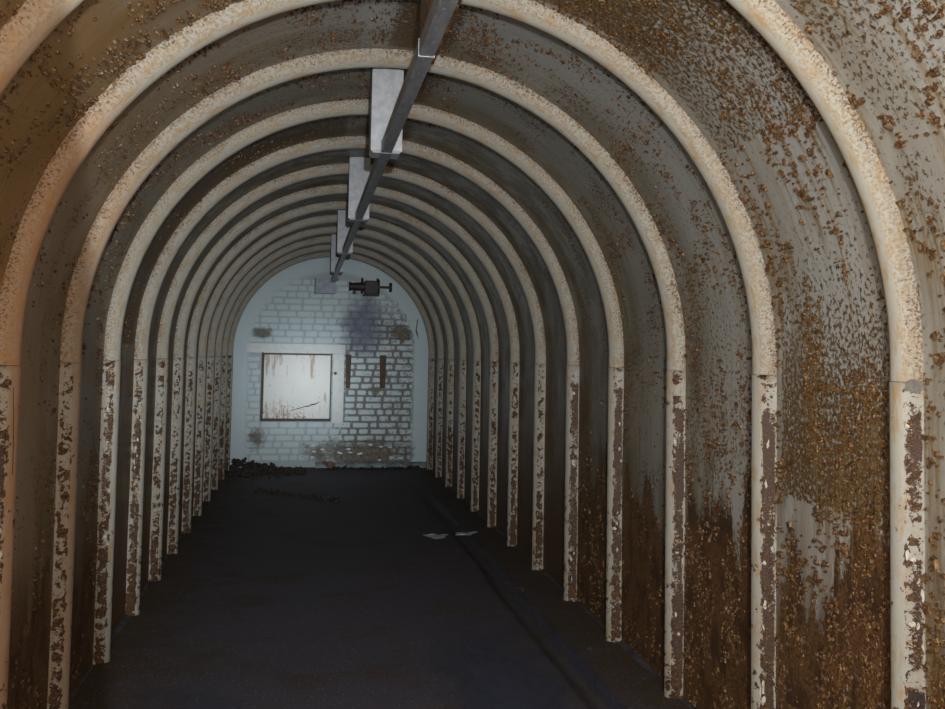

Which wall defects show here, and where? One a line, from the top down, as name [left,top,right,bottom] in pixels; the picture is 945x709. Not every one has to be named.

corrosion [790,0,945,315]
peeling [100,407,114,523]
peeling [105,368,115,390]
peeling [570,381,579,589]
peeling [612,384,623,627]
peeling [672,406,685,680]
peeling [760,408,777,709]
peeling [905,379,923,394]
peeling [905,410,923,519]
peeling [905,550,925,673]
peeling [907,687,926,709]
corrosion [921,328,945,709]